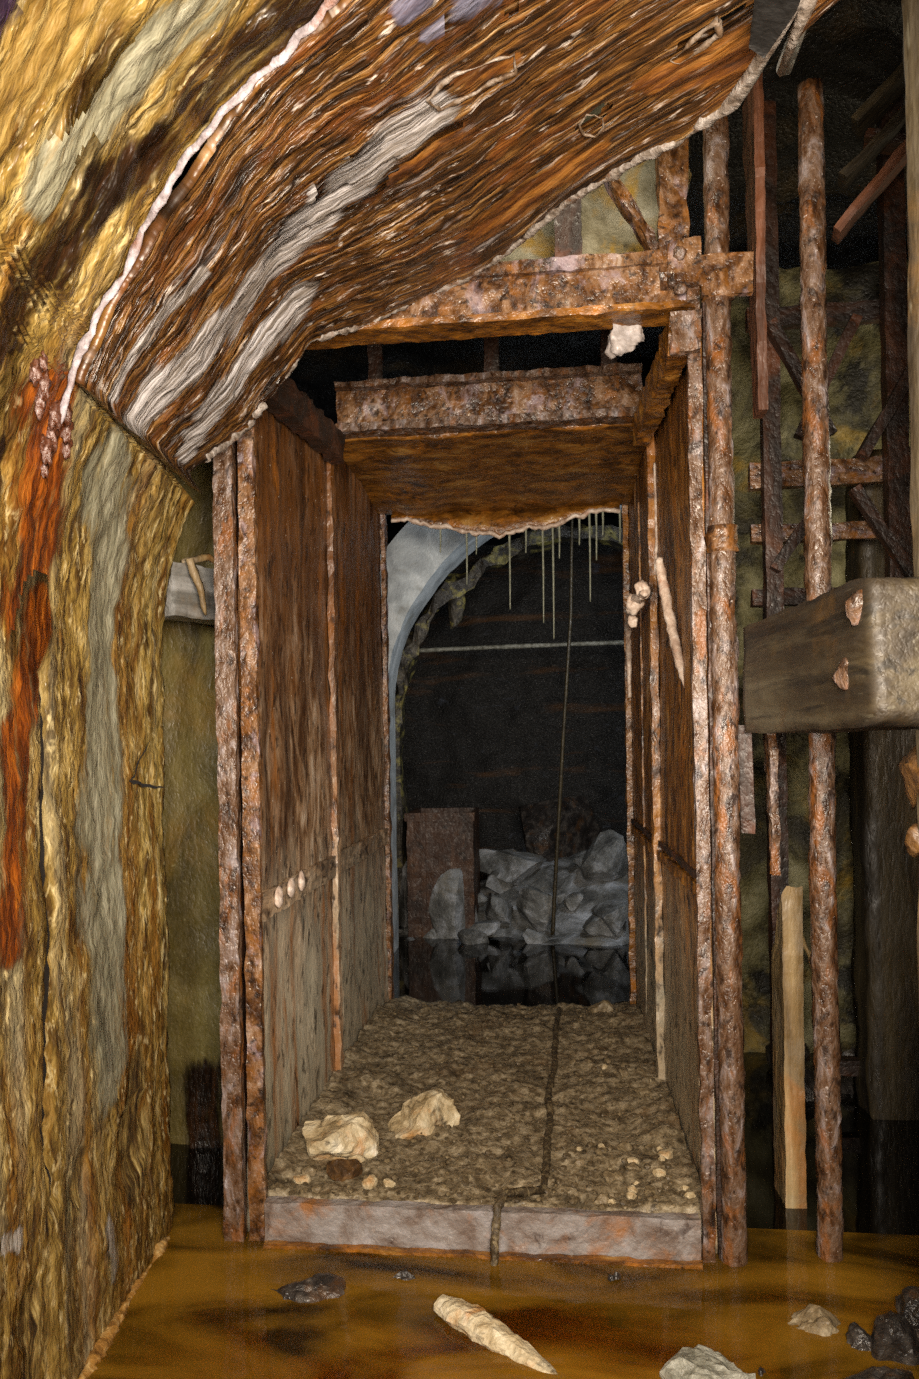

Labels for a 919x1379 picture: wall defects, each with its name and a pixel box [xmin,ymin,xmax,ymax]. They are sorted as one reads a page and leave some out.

damp [0,0,324,366]
damp [72,92,461,1118]
corrosion [0,0,840,969]